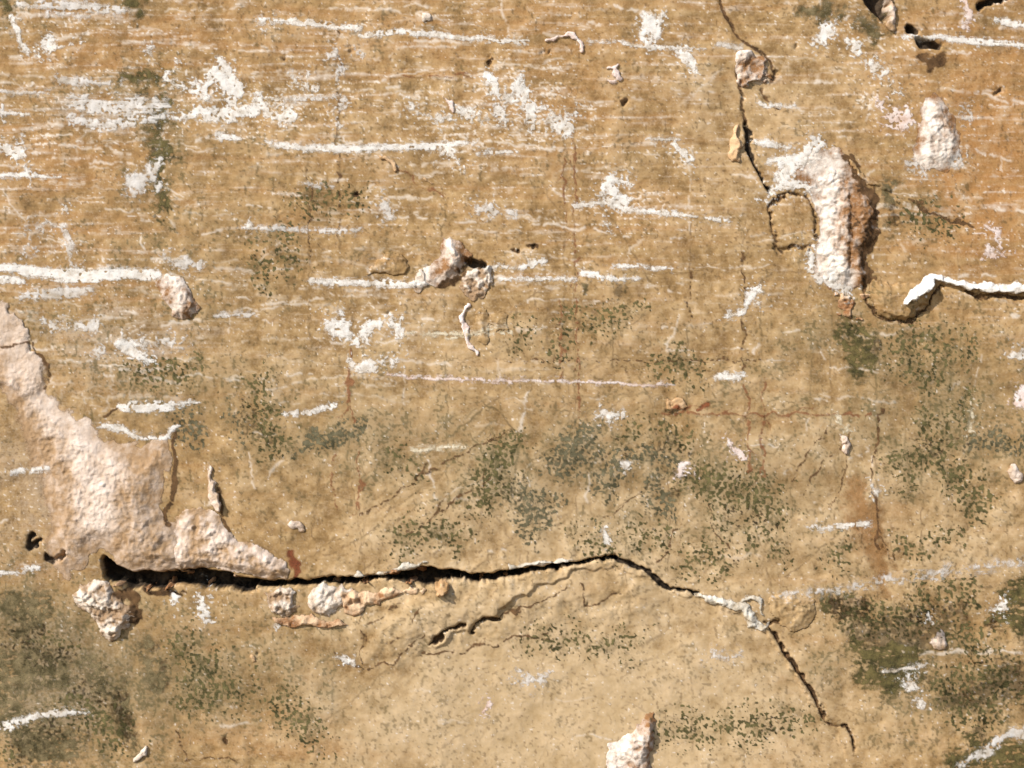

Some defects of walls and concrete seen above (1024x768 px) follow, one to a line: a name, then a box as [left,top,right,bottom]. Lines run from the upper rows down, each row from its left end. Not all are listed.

spalling [881,0,896,33]
crack [719,0,819,253]
crack [862,285,1024,324]
peeling [39,314,193,366]
peeling [207,466,221,512]
rust [848,480,888,584]
rust [287,550,301,578]
crack [104,529,700,671]
damp [819,590,854,614]
damp [983,576,1024,636]
crack [763,620,855,751]
damp [842,618,927,698]